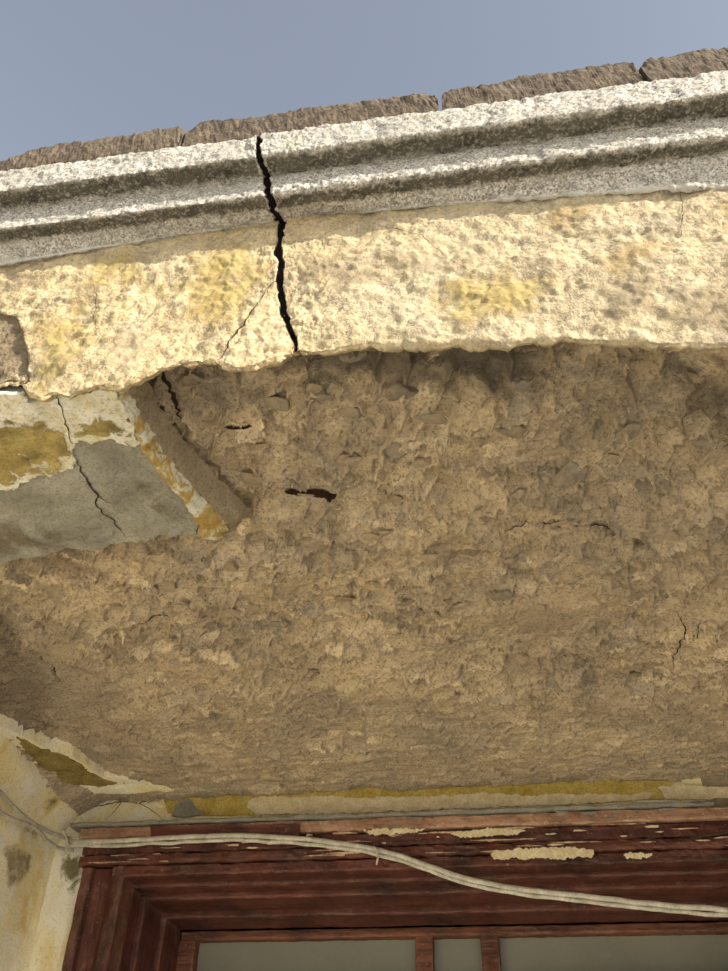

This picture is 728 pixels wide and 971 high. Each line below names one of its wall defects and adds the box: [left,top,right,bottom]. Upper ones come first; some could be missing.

crack [221,136,298,358]
spalling [0,313,30,384]
crack [56,397,126,537]
crack [162,372,187,427]
flaking render [0,342,728,864]